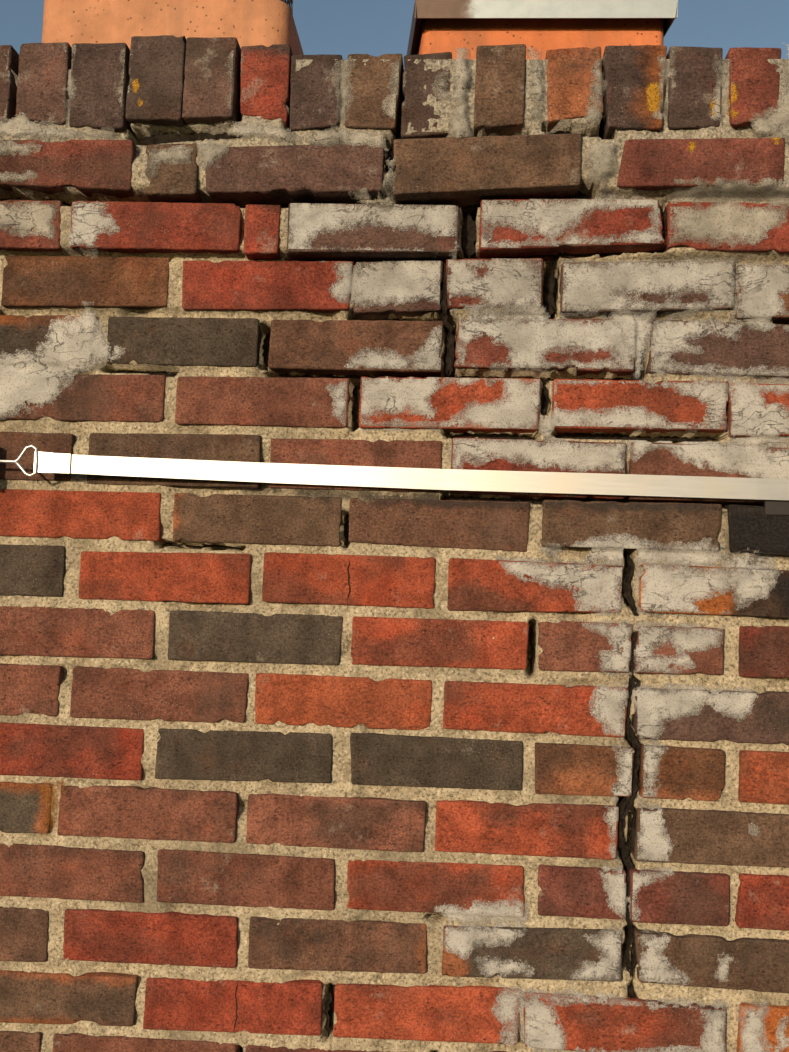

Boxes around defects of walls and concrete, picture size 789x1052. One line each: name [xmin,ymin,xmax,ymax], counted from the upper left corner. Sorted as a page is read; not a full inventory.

crack [618,549,641,998]
crack [232,983,240,1052]
crack [324,989,332,1037]